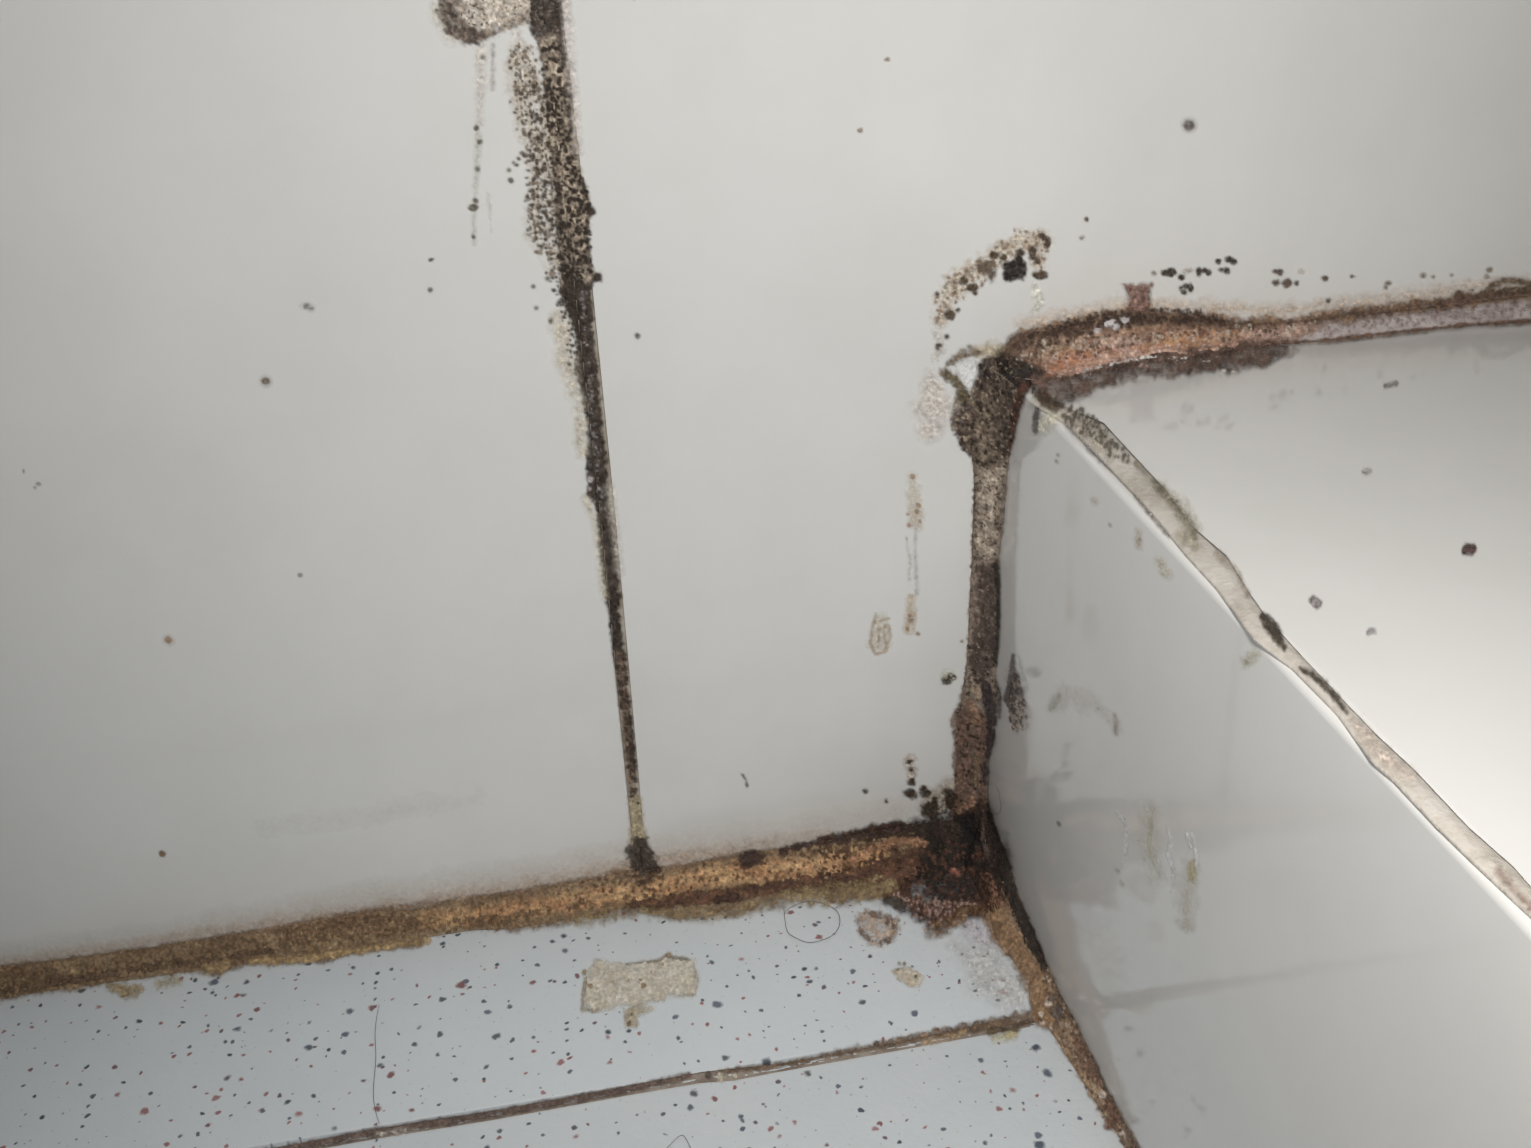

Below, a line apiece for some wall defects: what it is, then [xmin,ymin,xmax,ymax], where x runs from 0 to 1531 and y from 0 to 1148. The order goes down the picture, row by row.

leakage [434,0,661,876]
mould [921,231,1129,469]
mould [1152,256,1237,294]
leakage [1272,269,1303,288]